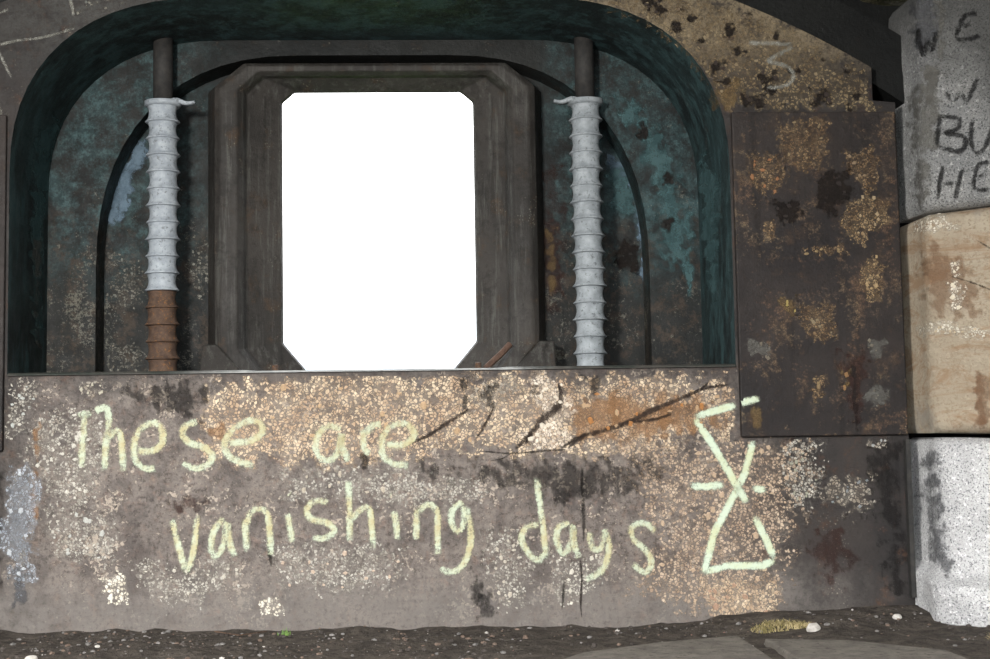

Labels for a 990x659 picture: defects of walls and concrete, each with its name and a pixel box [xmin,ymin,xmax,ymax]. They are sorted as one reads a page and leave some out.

crack [405,383,728,461]
corrosion [567,391,715,441]
leakage [920,451,954,576]